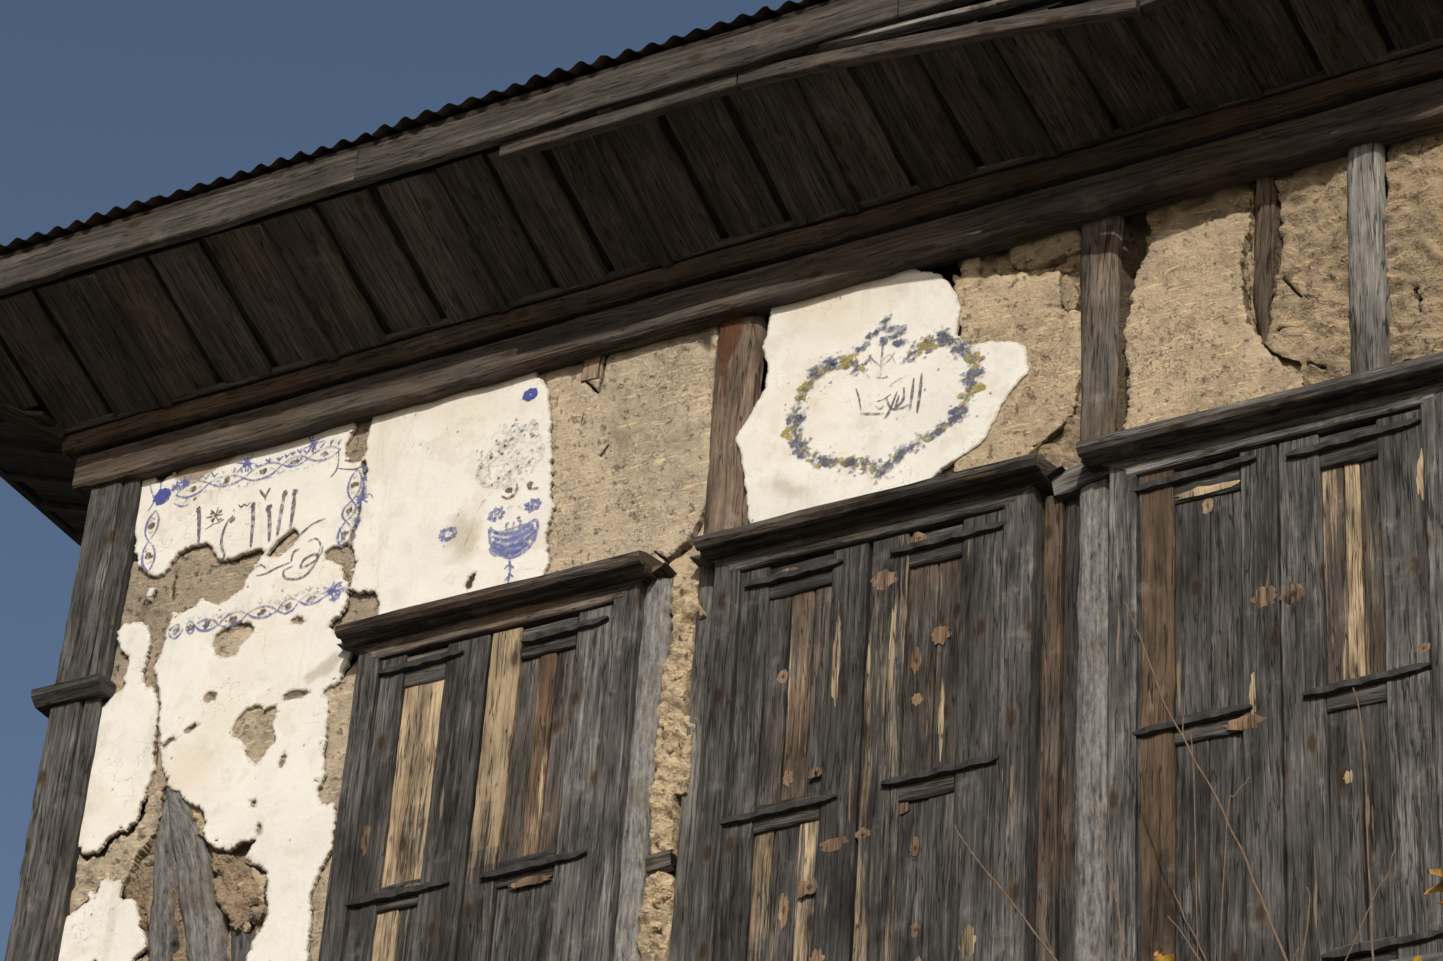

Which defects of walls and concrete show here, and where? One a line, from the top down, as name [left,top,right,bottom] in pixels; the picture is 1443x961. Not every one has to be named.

flaking render [981,244,1081,294]
crack [1245,175,1327,370]
flaking render [345,421,372,464]
flaking render [538,326,719,574]
flaking render [1037,391,1082,470]
flaking render [326,545,379,631]
flaking render [70,530,299,961]
flaking render [233,657,359,961]